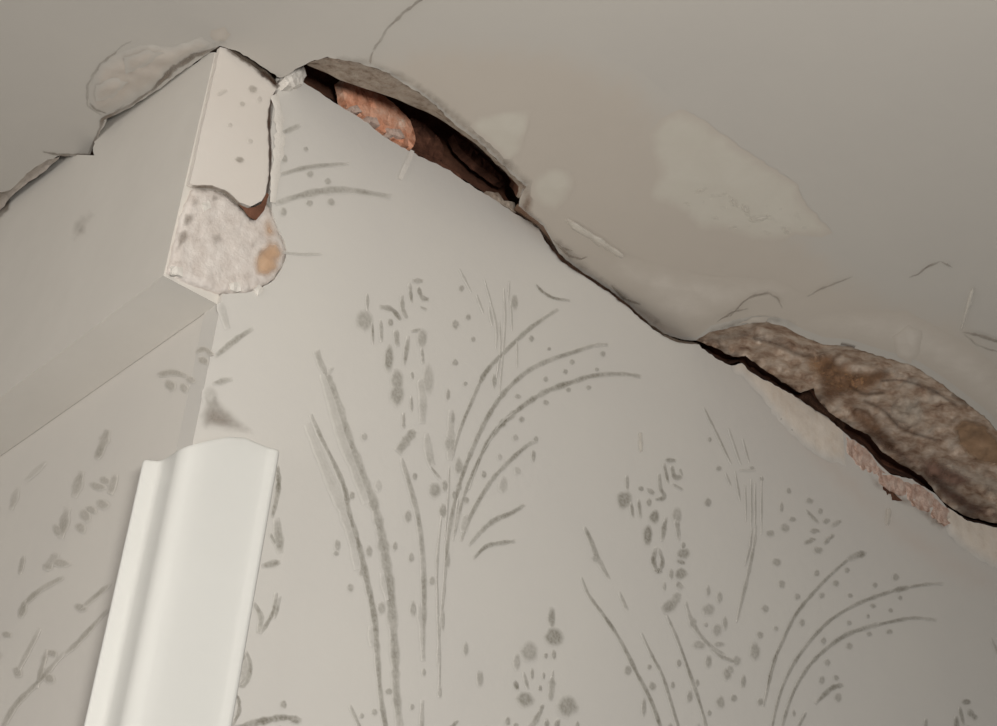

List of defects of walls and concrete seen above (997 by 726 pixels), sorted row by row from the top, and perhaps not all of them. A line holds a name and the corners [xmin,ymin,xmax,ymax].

peeling [88,27,286,296]
spalling [307,58,576,212]
crack [514,204,696,344]
spalling [608,252,997,568]